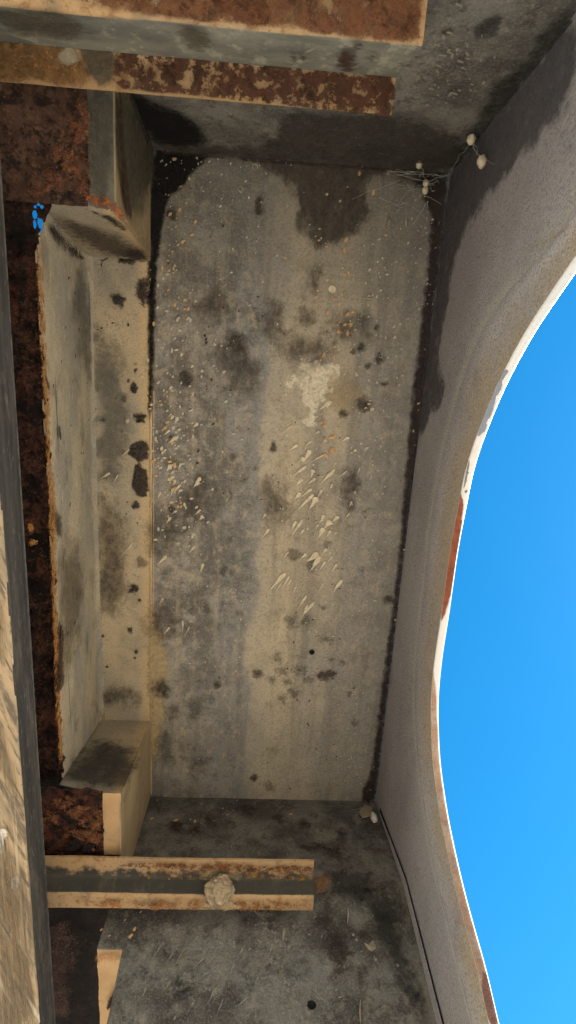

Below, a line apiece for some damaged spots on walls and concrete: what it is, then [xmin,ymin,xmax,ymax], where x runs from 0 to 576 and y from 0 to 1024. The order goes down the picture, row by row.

rust [86,0,422,42]
rust [0,42,395,220]
rust [37,246,65,761]
leakage [128,441,149,509]
rust [149,400,182,518]
leakage [253,27,576,802]
rust [441,495,463,619]
rust [48,796,103,850]
rust [119,863,315,881]